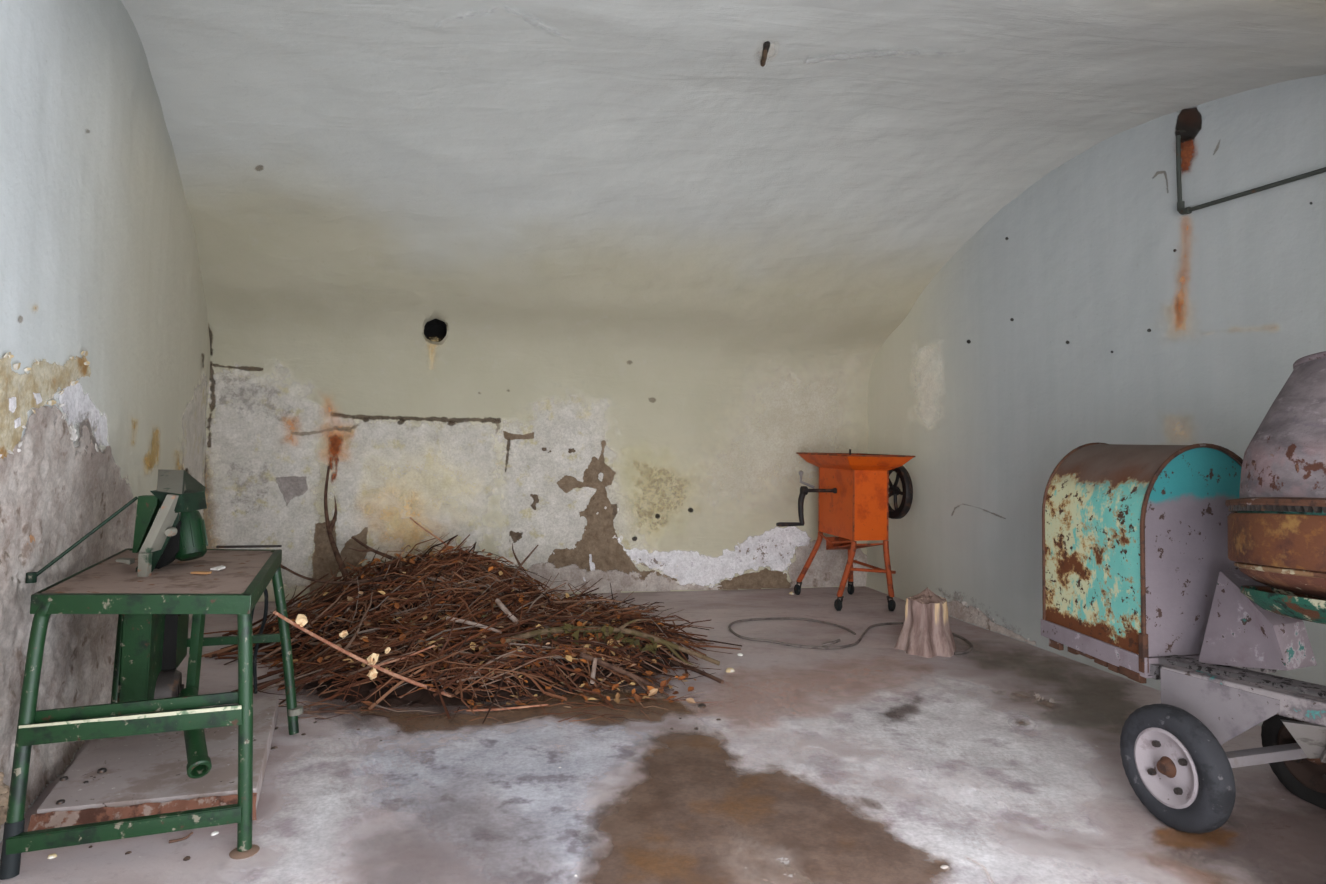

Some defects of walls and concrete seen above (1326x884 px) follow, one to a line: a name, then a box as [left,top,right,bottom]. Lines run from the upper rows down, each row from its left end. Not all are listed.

rust [1181,140,1195,173]
peeling [182,368,368,599]
rust [329,430,342,481]
spalling [0,351,137,788]
efflorescence [616,526,810,588]
spalling [25,740,257,831]
leakage [706,681,1099,884]